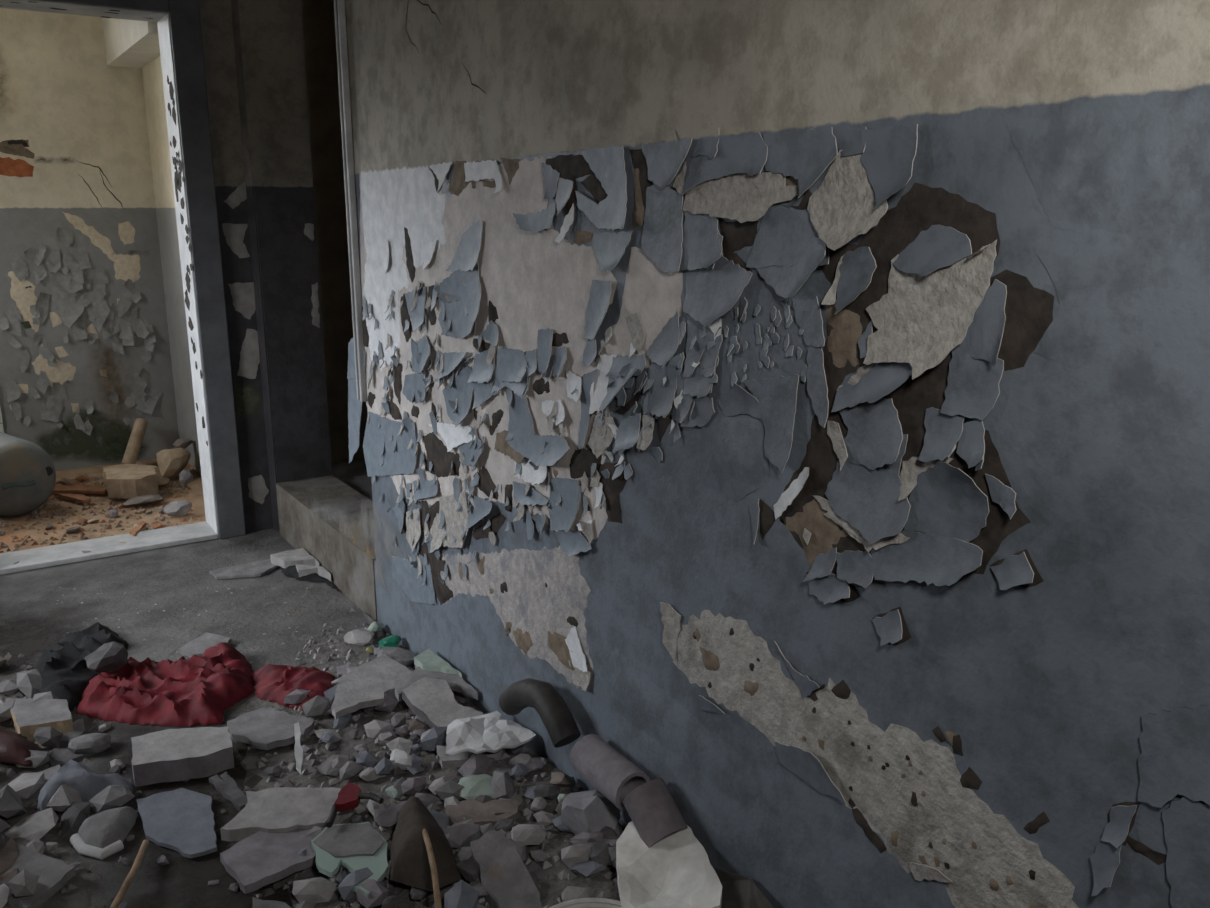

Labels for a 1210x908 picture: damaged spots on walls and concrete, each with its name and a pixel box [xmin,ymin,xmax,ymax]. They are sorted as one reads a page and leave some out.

flaking render [0,139,35,177]
crack [78,162,124,209]
peeling [222,182,250,258]
peeling [0,212,162,435]
peeling [228,282,260,379]
peeling [347,123,1054,691]
spalling [660,602,1079,908]
peeling [1090,705,1210,908]